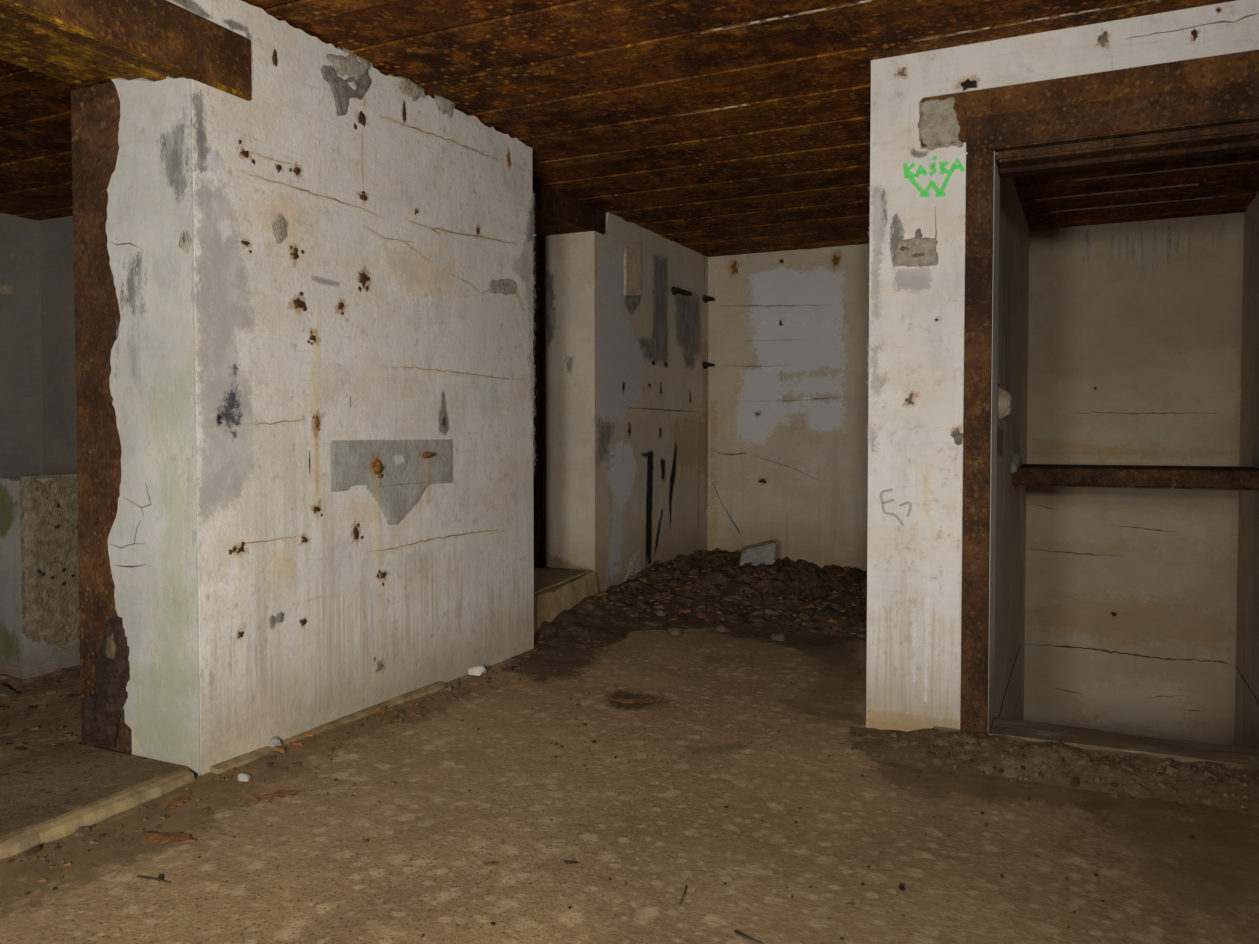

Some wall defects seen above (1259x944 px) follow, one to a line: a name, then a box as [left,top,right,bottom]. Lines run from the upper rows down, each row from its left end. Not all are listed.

spalling [1124,13,1259,40]
spalling [320,47,373,116]
rust [961,79,977,91]
spalling [870,185,938,324]
rust [358,270,370,292]
rust [293,291,307,311]
peeling [737,266,847,444]